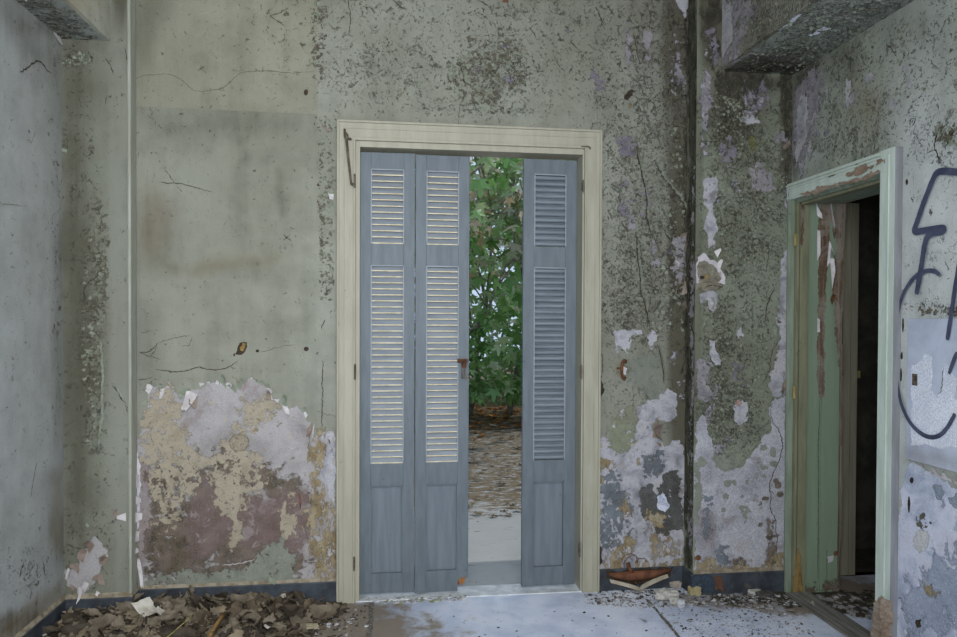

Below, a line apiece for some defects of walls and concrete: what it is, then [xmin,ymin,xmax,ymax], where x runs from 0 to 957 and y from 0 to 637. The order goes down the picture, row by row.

crack [106,49,313,92]
crack [762,251,781,381]
peeling [600,0,957,592]
peeling [64,523,108,604]
peeling [114,373,336,588]
crack [762,404,783,567]
peeling [870,462,957,637]